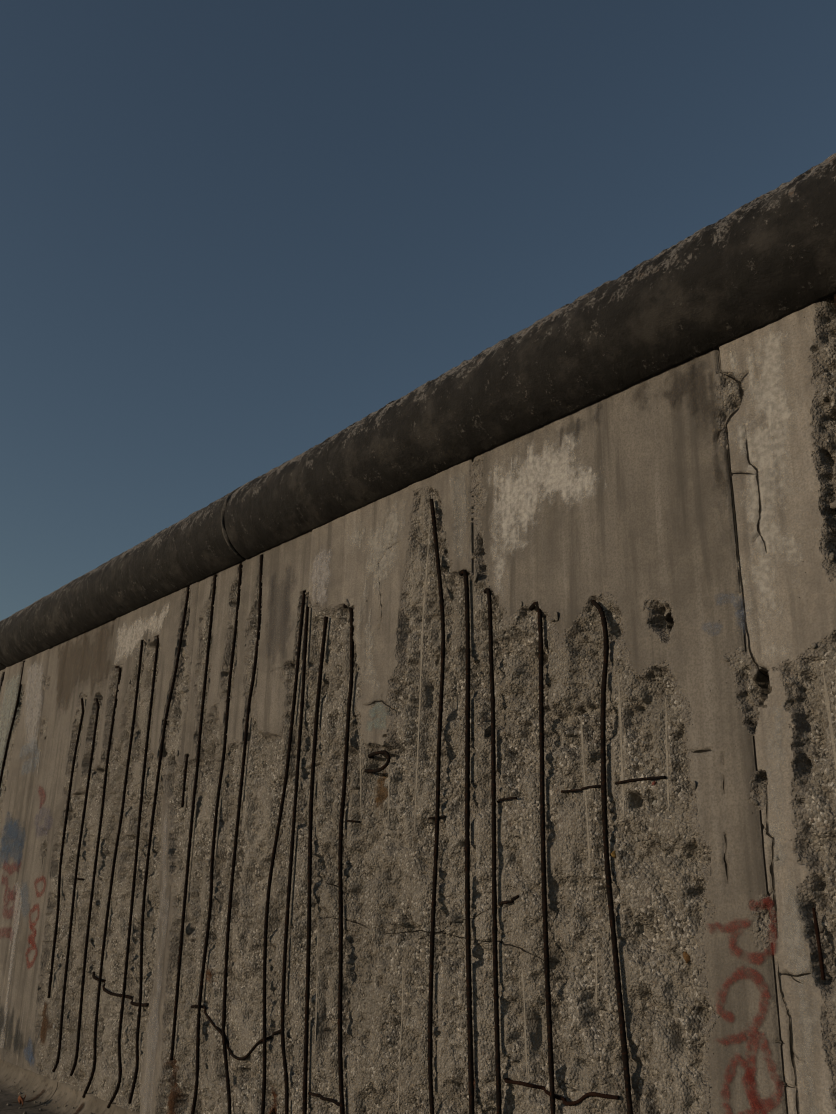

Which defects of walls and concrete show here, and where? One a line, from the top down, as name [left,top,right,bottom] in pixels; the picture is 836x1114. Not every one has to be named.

spalling [714,371,747,450]
crack [717,353,769,677]
spalling [808,294,836,582]
spalling [35,457,721,1114]
spalling [723,647,762,736]
spalling [749,769,768,810]
spalling [748,894,779,952]
spalling [772,630,836,1111]